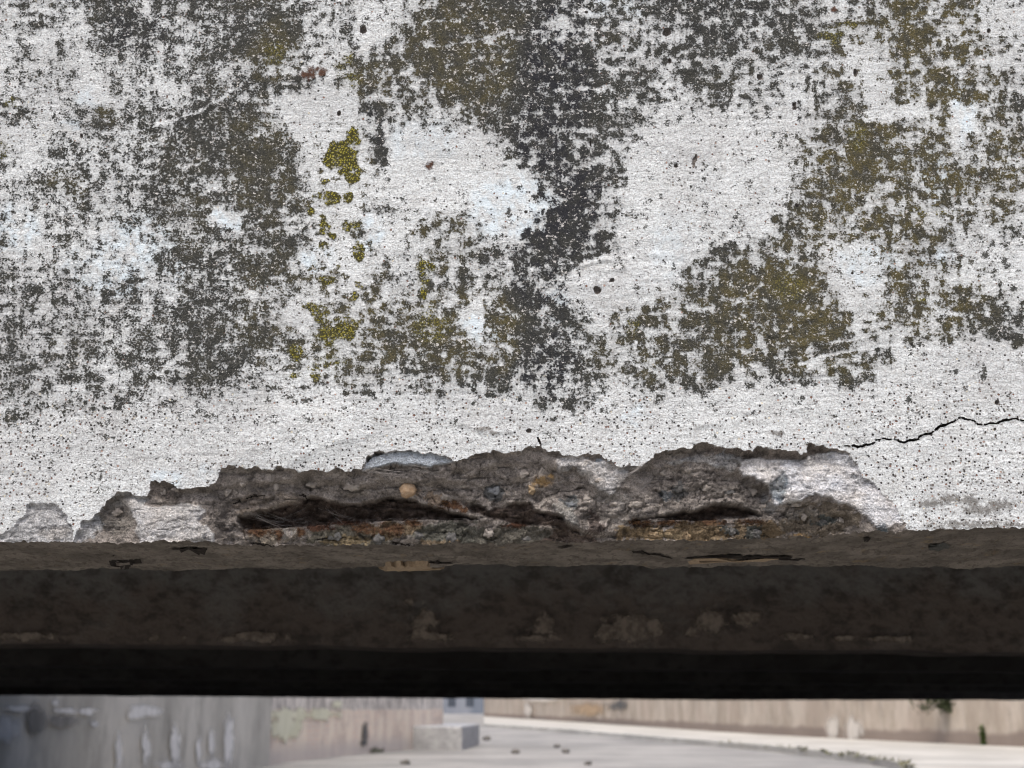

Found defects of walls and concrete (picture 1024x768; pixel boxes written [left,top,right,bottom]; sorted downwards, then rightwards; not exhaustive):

damp [342,52,399,176]
damp [956,0,1024,116]
damp [0,0,325,428]
damp [482,0,818,421]
crack [844,417,1024,449]
spalling [0,442,909,547]
corrosion [628,518,764,528]